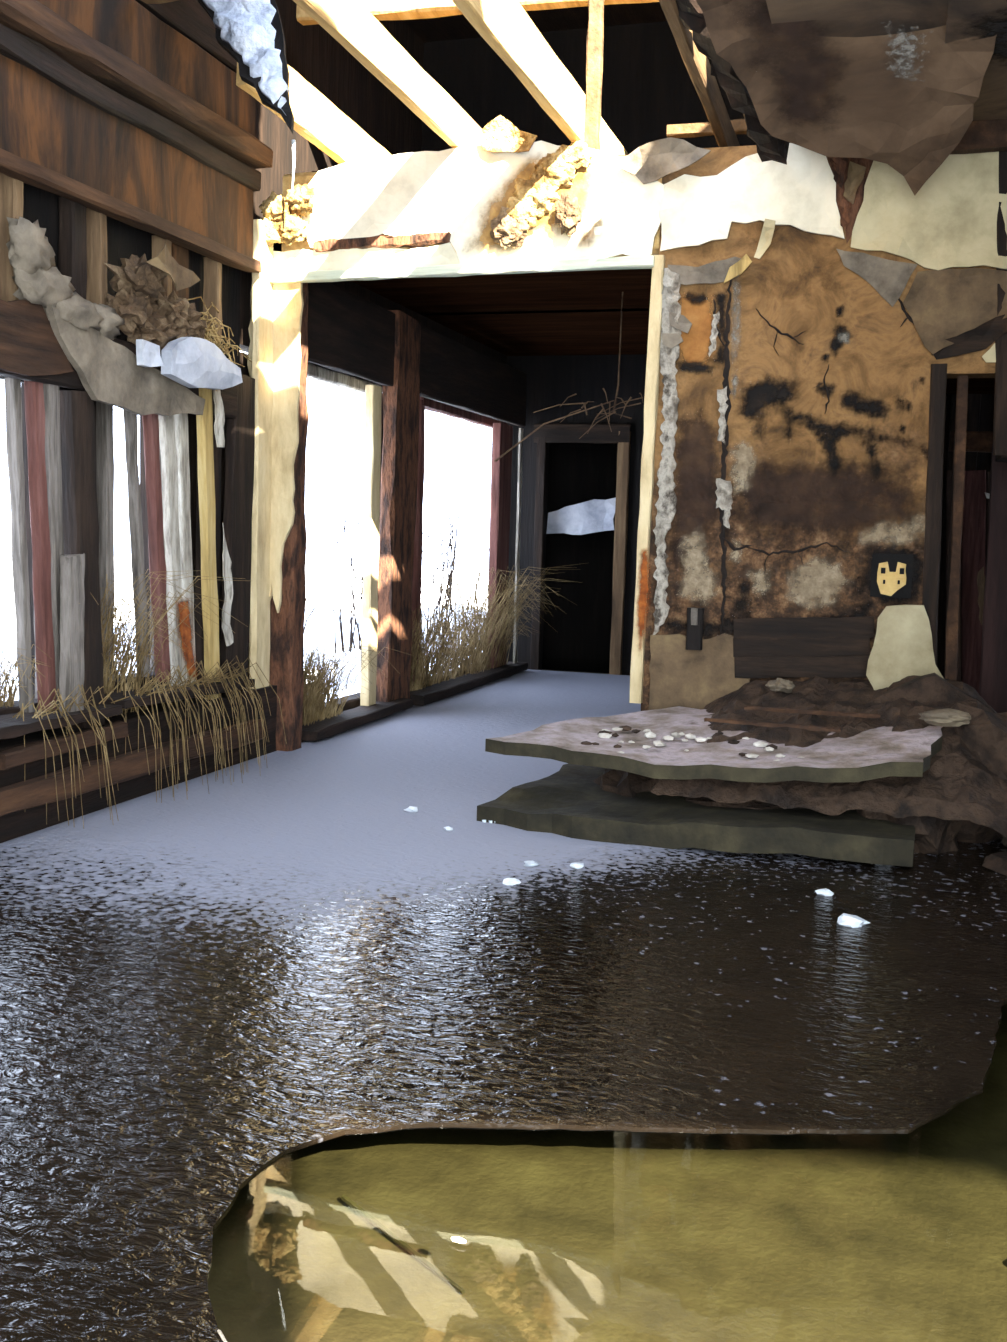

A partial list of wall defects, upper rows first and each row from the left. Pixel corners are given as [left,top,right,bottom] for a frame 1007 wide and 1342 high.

spalling [821,305,849,361]
peeling [826,157,1007,363]
leakage [666,377,928,639]